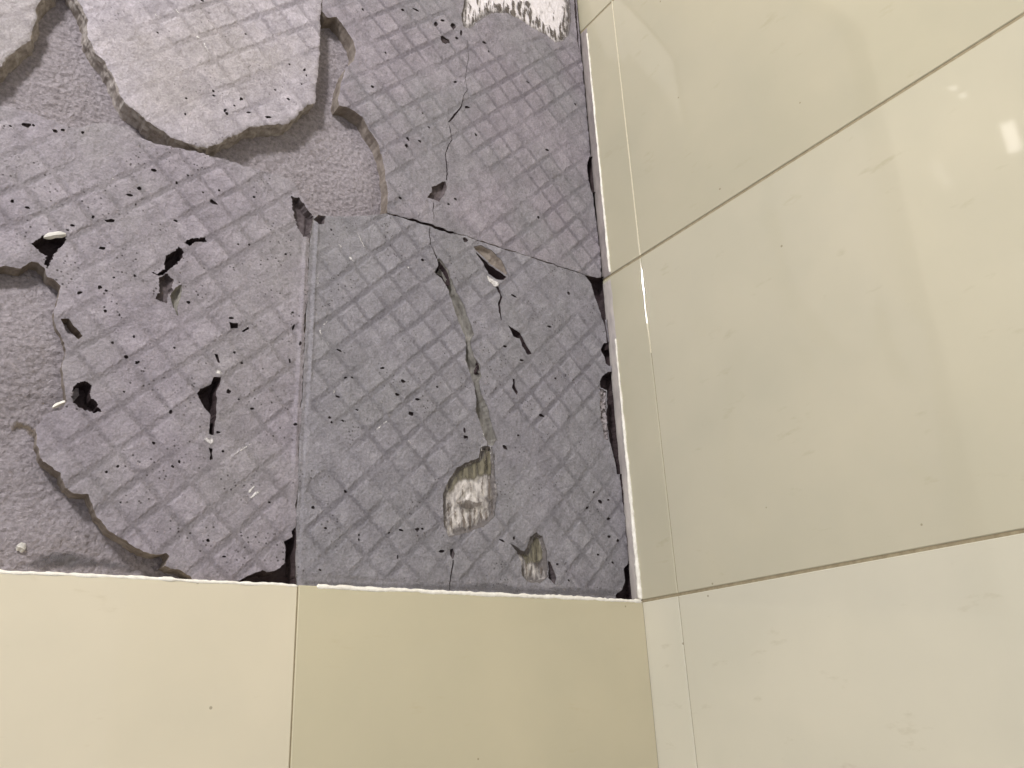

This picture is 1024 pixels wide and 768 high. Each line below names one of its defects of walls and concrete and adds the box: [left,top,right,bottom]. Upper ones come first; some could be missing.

spalling [0,0,153,143]
spalling [211,28,381,238]
crack [445,63,468,180]
crack [570,0,579,47]
spalling [43,224,75,239]
crack [389,203,582,446]
spalling [0,270,180,579]
spalling [443,434,507,537]
spalling [499,533,569,583]